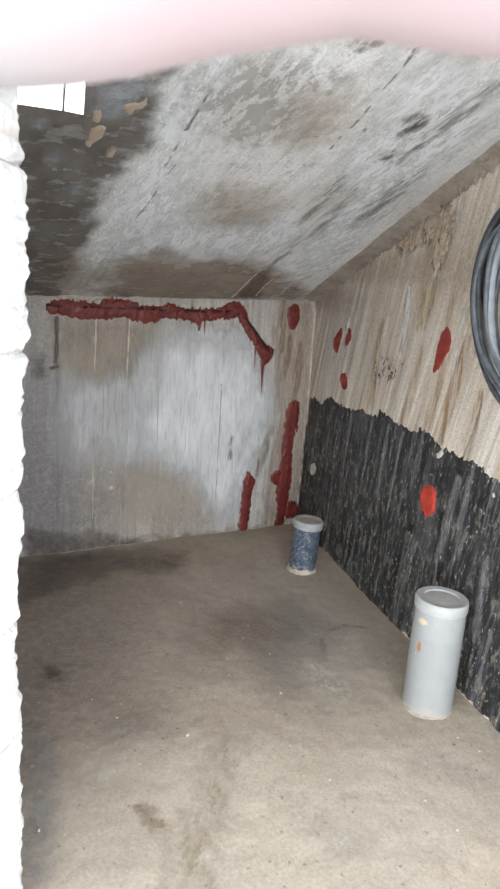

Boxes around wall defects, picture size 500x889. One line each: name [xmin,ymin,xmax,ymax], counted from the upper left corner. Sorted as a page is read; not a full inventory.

peeling [85,110,106,147]
peeling [123,98,148,115]
crack [165,96,207,175]
damp [17,55,500,531]
rust [51,317,59,369]
damp [436,477,470,563]
damp [473,559,488,642]